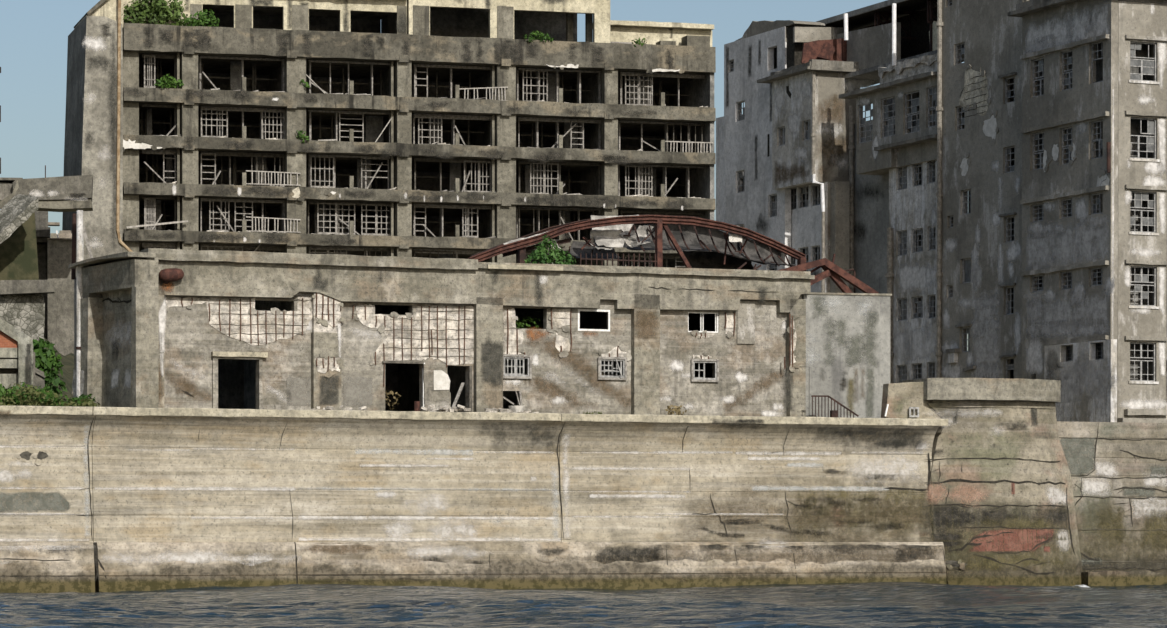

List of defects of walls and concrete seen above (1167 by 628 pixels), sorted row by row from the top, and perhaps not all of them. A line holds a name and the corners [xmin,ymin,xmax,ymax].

flaking render [959,64,999,144]
spalling [158,292,474,386]
damp [0,471,88,515]
crack [694,494,737,565]
crack [885,424,1167,575]